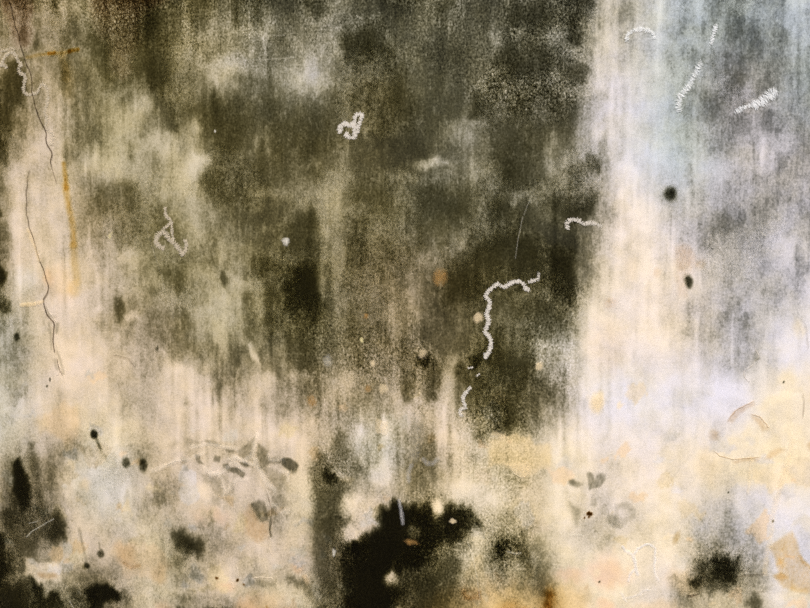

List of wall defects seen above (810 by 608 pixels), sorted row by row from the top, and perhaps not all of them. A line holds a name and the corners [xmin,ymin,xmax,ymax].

crack [9,2,52,164]
crack [26,173,66,389]
mould [242,205,326,374]
damp [337,0,598,442]
damp [587,155,601,175]
damp [700,11,764,121]
damp [761,109,783,133]
damp [0,443,131,608]
mould [310,428,483,608]
mould [689,525,742,595]